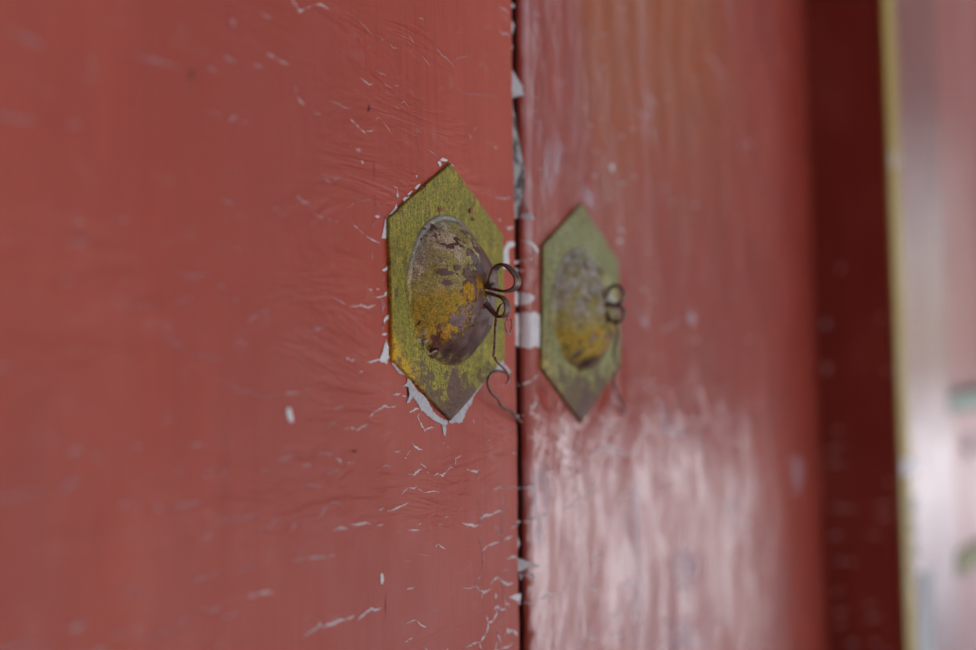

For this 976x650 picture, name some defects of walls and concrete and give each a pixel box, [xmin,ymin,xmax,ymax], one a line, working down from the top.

peeling [375,175,420,239]
peeling [498,70,539,272]
peeling [367,314,483,436]
peeling [518,539,539,580]